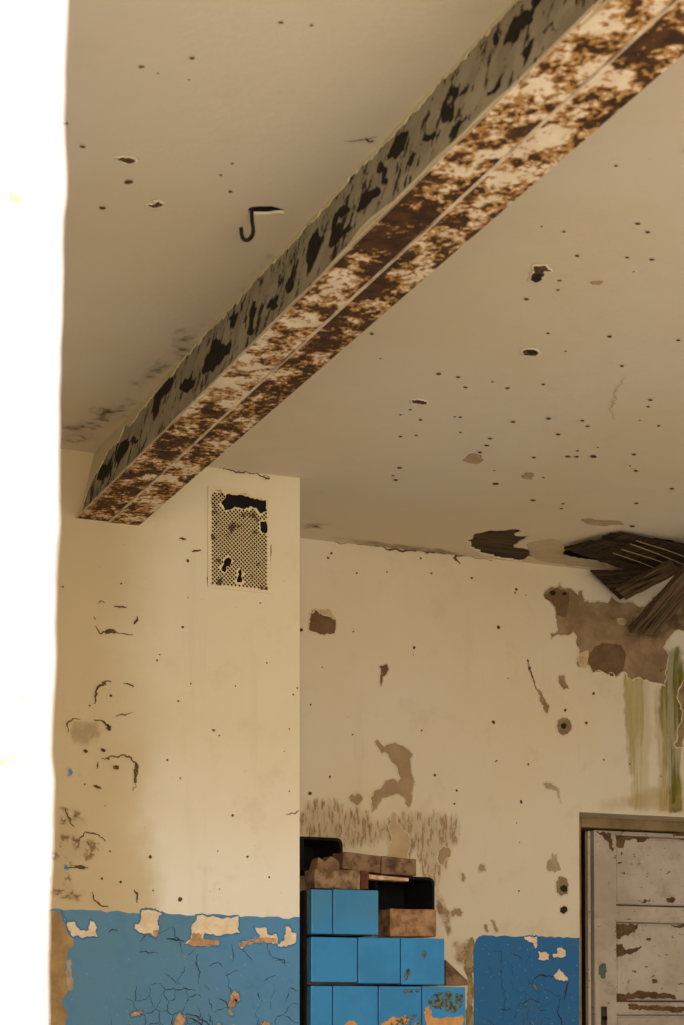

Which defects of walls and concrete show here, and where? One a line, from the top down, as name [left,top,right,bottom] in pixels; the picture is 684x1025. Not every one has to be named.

rust [78,0,684,526]
spalling [300,608,338,637]
spalling [542,582,684,686]
spalling [536,688,588,737]
water stain [625,674,644,767]
peeling [348,739,416,859]
peeling [133,907,165,940]
spalling [173,1010,188,1025]
crack [109,926,298,1025]
peeling [184,913,299,950]
crack [488,951,568,1025]
spalling [523,935,570,983]